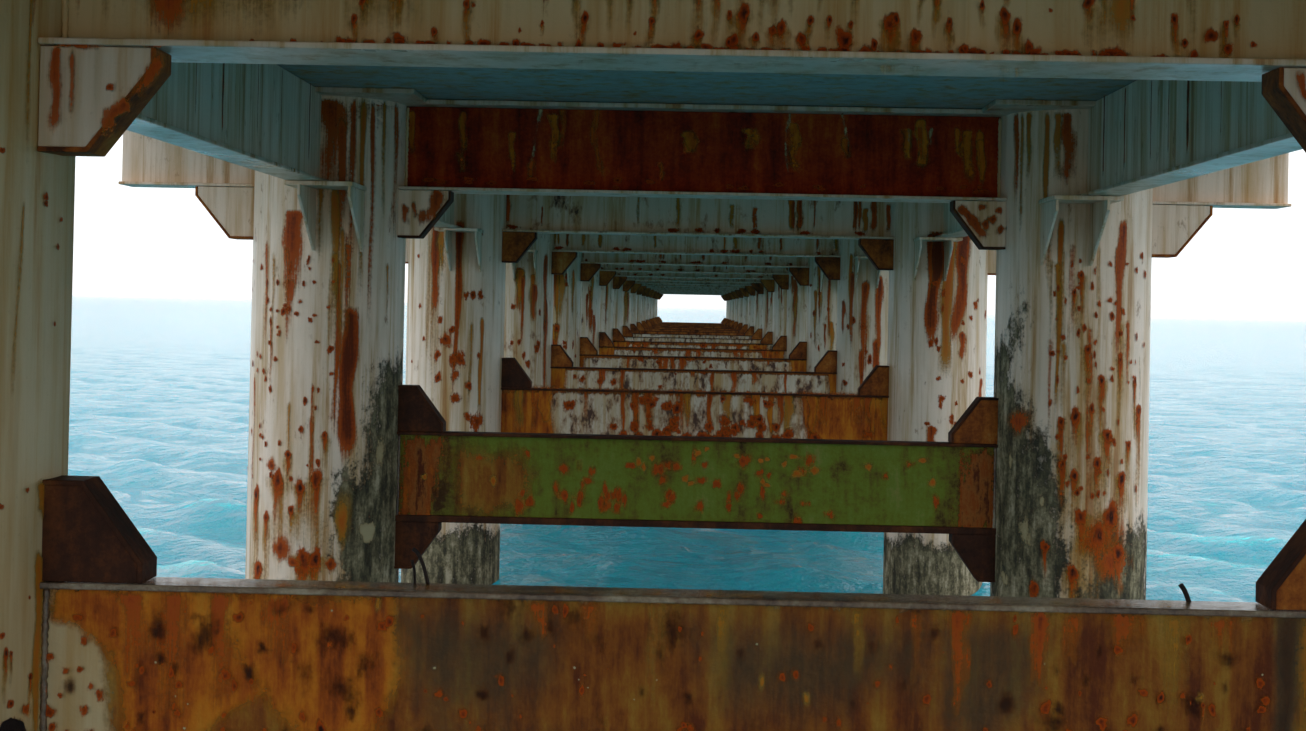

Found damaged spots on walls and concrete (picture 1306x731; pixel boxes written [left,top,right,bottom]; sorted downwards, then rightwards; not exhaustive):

corrosion [49,44,98,127]
corrosion [101,0,217,133]
corrosion [1153,13,1240,58]
corrosion [1296,73,1306,100]
corrosion [457,111,521,229]
corrosion [1013,113,1077,215]
corrosion [315,99,484,457]
water stain [327,353,500,585]
corrosion [0,187,1306,731]
water stain [883,302,1147,600]